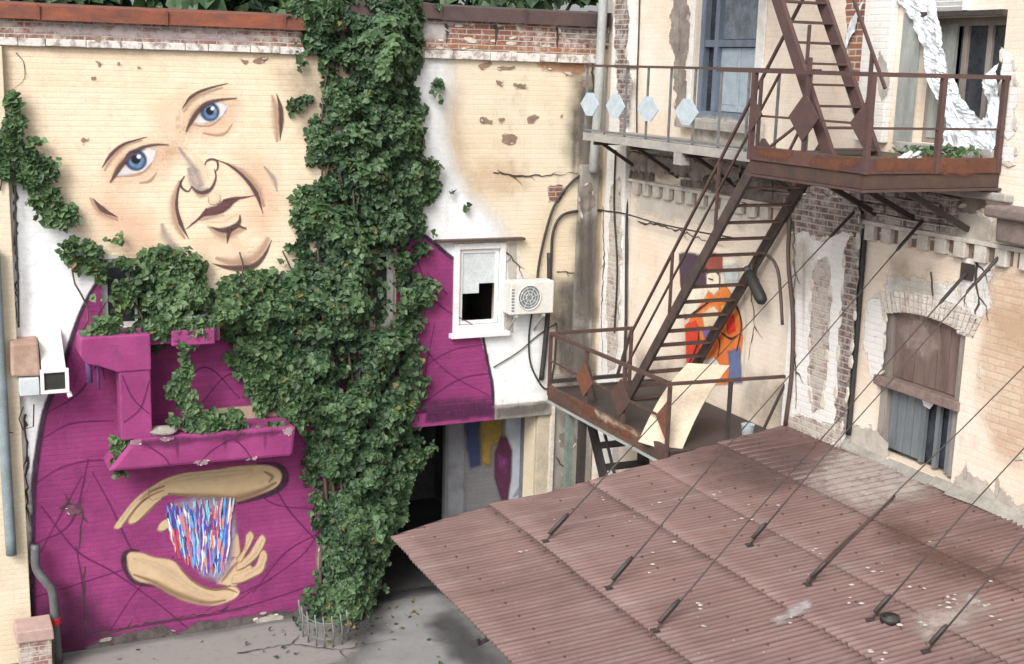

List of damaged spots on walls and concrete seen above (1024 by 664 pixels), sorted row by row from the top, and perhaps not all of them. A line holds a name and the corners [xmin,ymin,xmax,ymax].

spalling [480,116,517,145]
spalling [422,0,633,132]
crack [493,170,578,185]
peeling [669,0,691,126]
spalling [845,0,866,86]
rust [875,157,997,175]
peeling [992,47,1019,168]
peeling [783,192,1024,460]